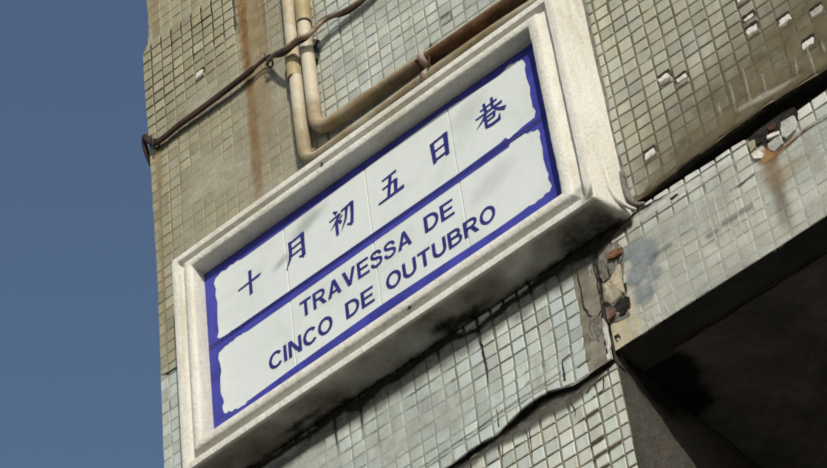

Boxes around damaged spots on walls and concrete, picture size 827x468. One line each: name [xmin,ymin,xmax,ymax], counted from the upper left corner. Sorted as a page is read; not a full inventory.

corrosion [237,0,263,80]
water stain [187,85,217,112]
crack [629,69,827,218]
spalling [748,107,799,160]
corrosion [759,140,792,164]
water stain [204,171,714,468]
crack [419,238,627,468]
spalling [588,242,631,355]